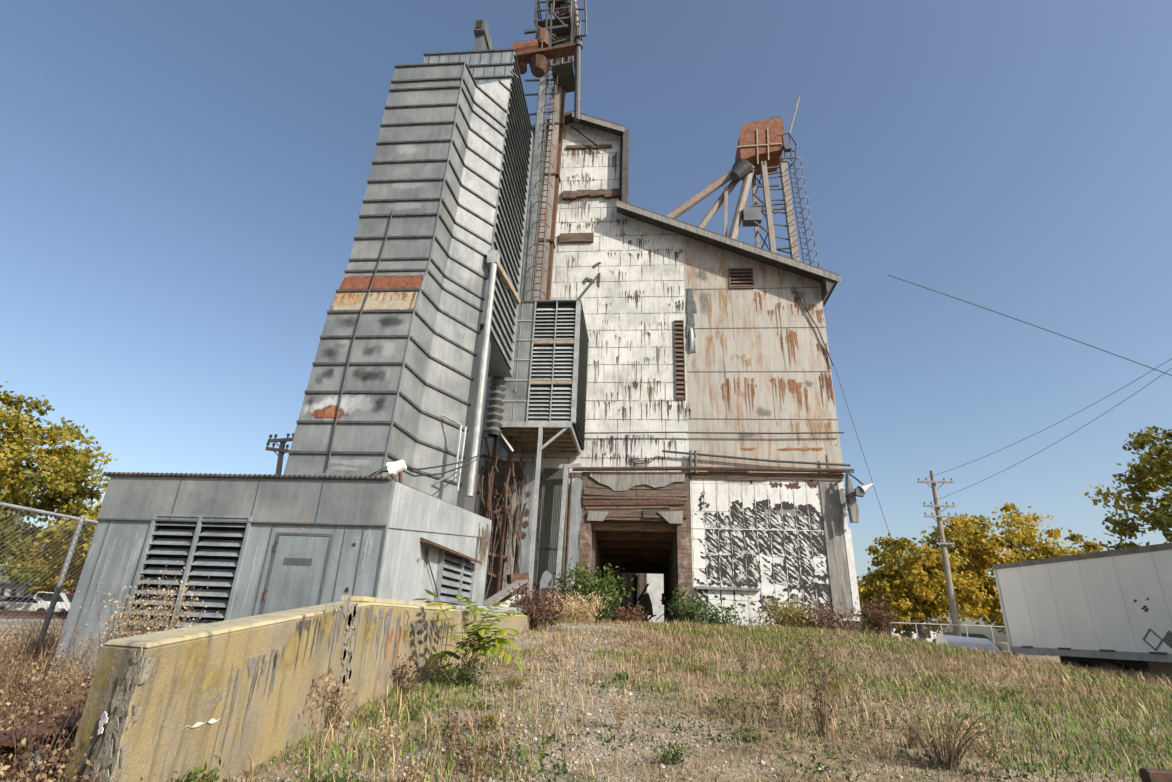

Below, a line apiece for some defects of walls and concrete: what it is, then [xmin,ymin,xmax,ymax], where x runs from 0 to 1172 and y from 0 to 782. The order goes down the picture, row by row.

damp [560,149,619,232]
corrosion [306,395,362,420]
corrosion [332,275,423,310]
damp [586,217,691,467]
corrosion [700,266,757,420]
corrosion [753,291,837,451]
peeling [693,480,833,618]
peeling [839,488,848,518]
spalling [89,644,156,782]
damp [209,604,453,771]